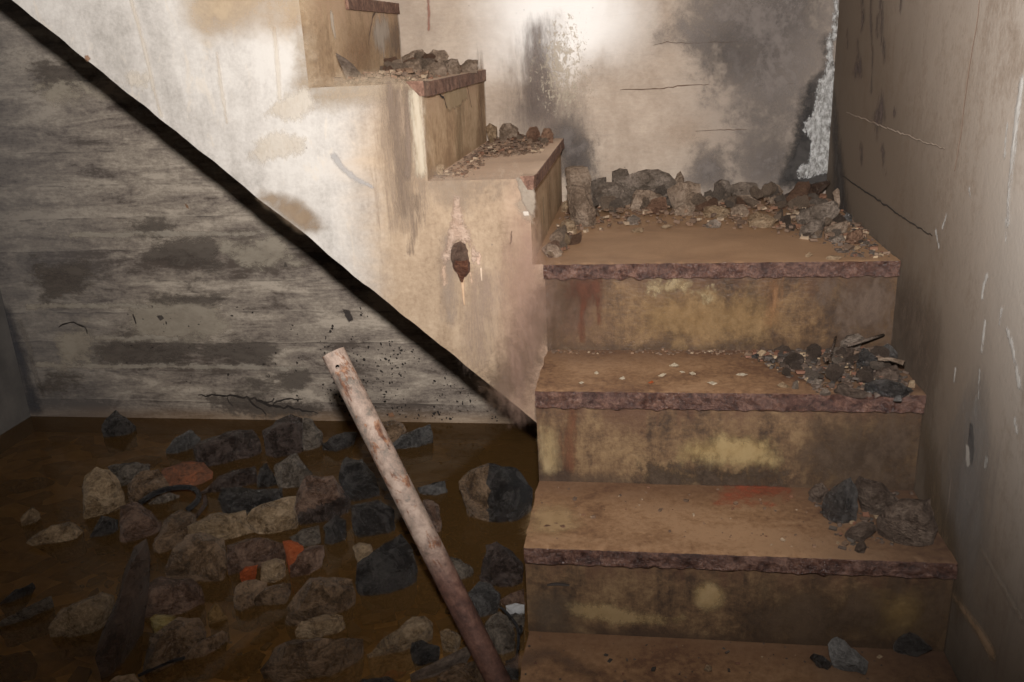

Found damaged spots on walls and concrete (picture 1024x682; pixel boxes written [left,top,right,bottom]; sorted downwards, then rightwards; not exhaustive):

leakage [31,61,81,90]
crack [622,83,709,91]
leakage [677,0,885,214]
crack [847,0,980,168]
crack [843,176,932,236]
leakage [132,216,224,273]
spalling [442,196,481,286]
leakage [34,261,92,304]
leakage [150,289,223,306]
crack [198,394,318,415]